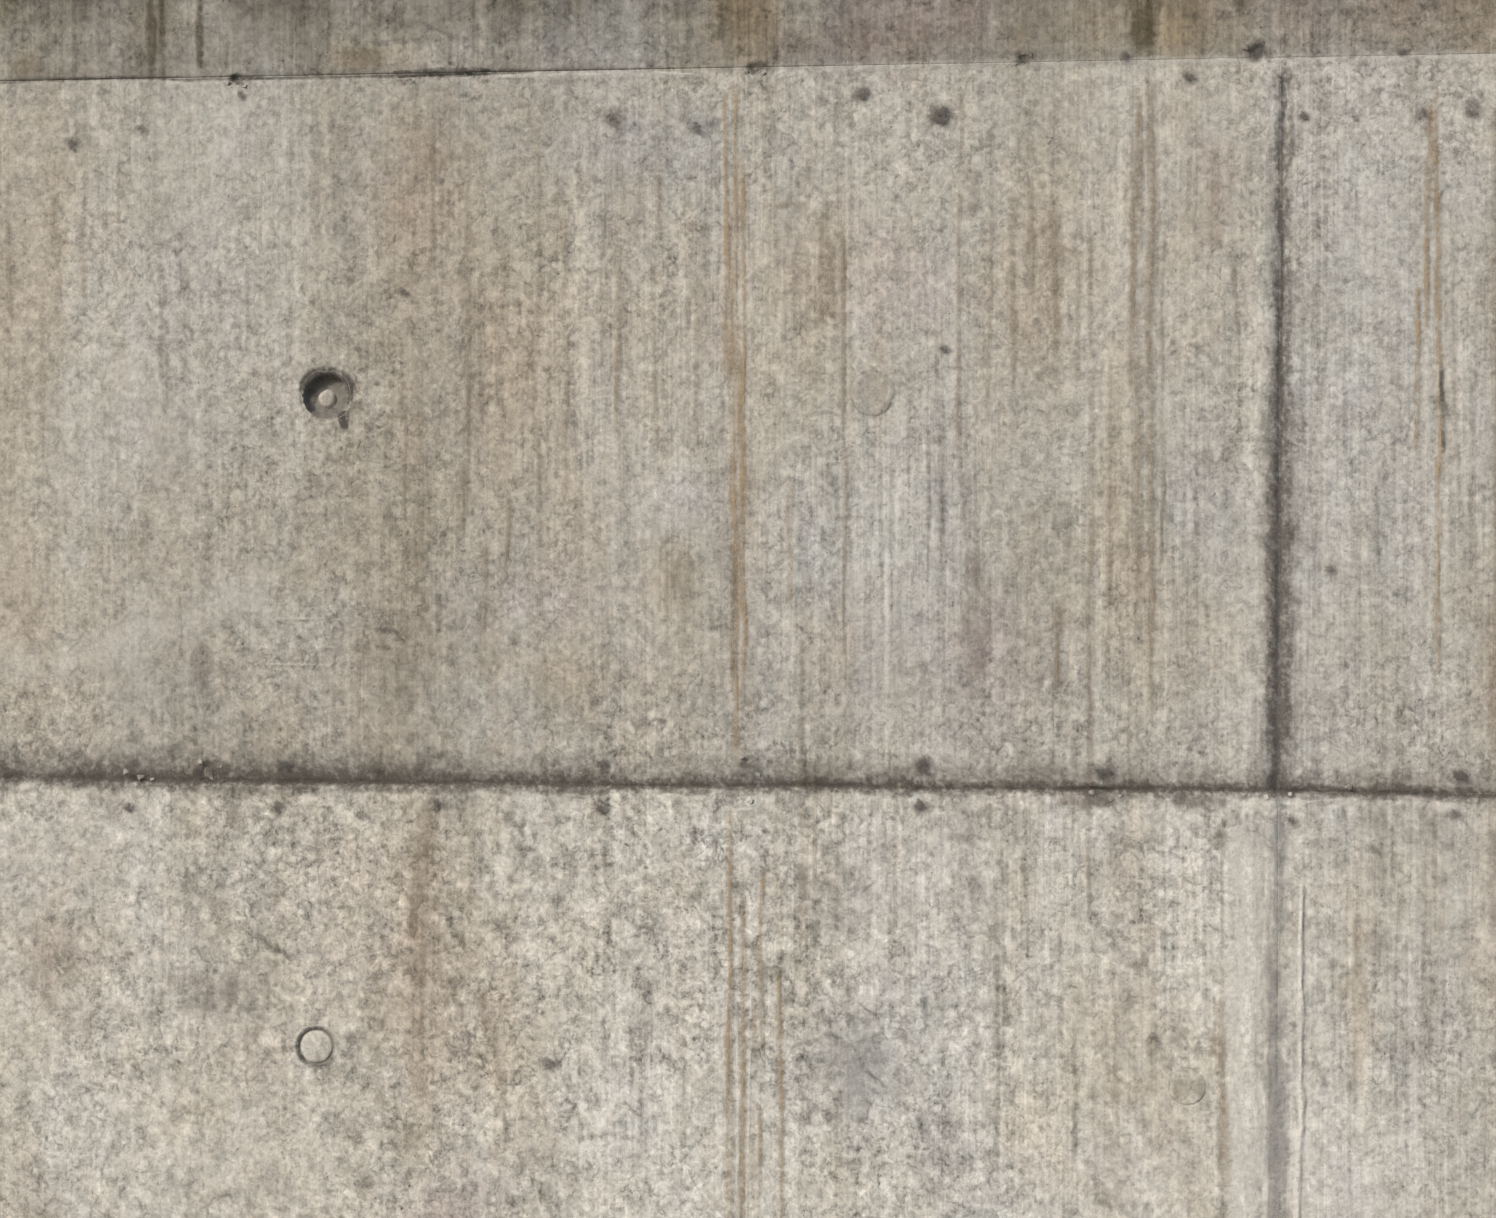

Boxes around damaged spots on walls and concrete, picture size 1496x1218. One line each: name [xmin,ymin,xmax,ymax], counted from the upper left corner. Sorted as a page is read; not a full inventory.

corrosion [724,94,746,742]
water stain [45,260,1495,802]
water stain [1275,188,1289,241]
corrosion [726,821,761,1204]